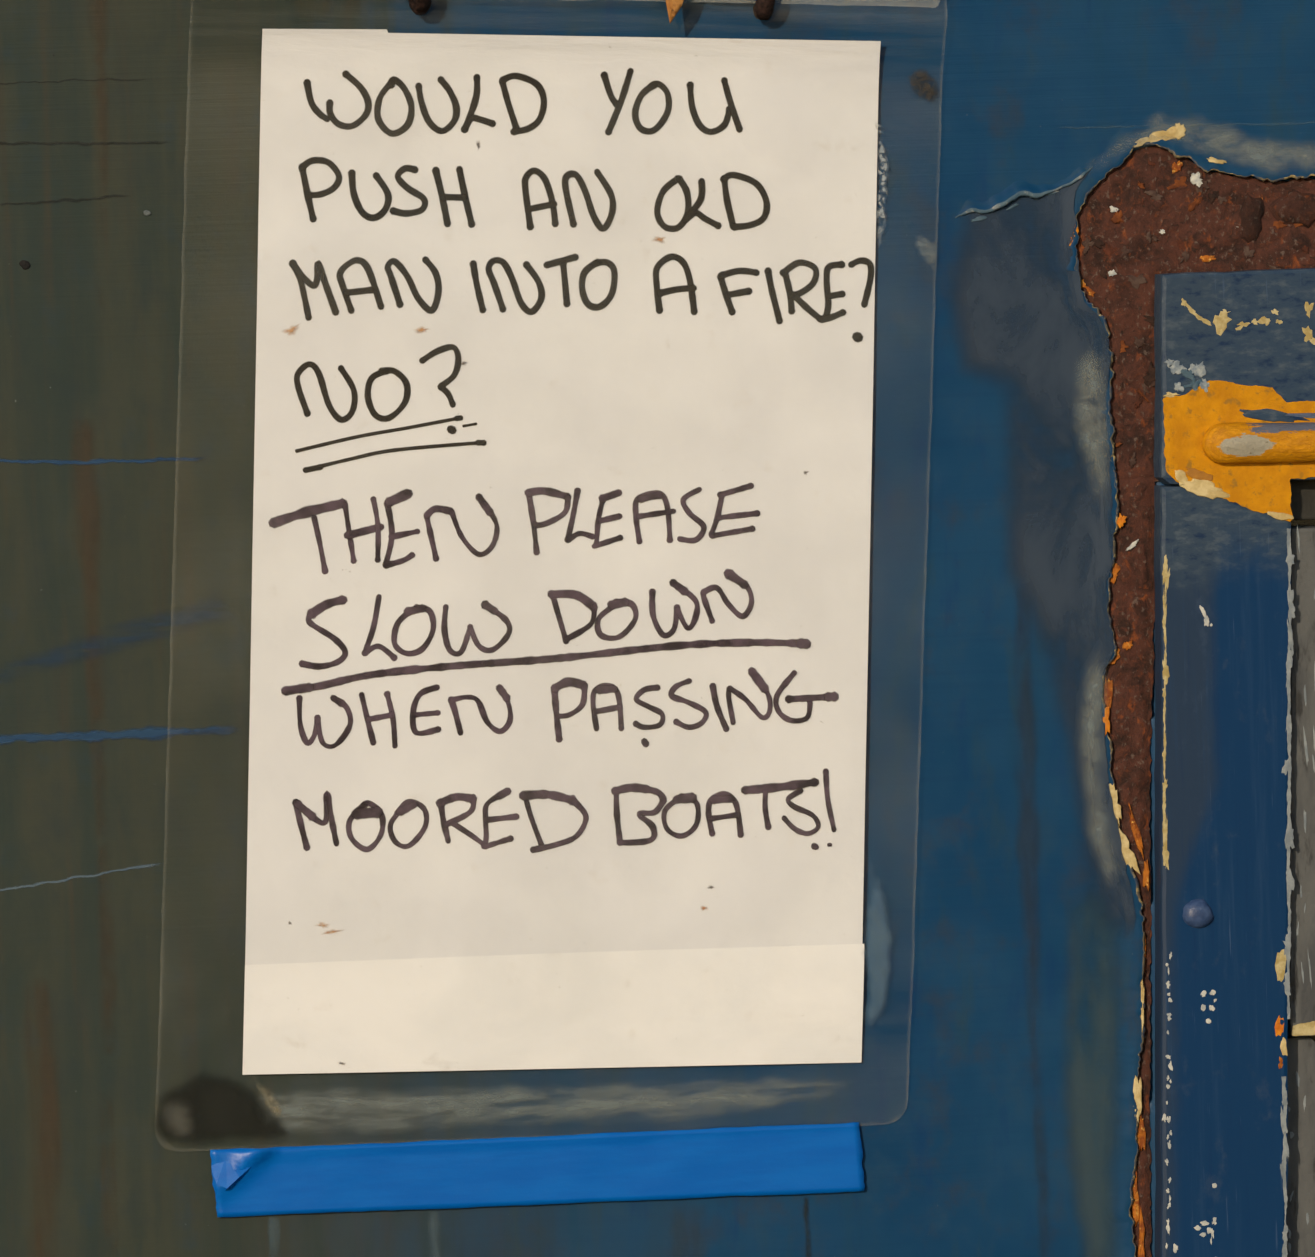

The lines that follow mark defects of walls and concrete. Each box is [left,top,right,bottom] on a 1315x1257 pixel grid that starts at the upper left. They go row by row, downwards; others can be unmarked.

peeling [1181,298,1283,336]
peeling [1302,302,1315,345]
rust [1053,114,1315,1257]
peeling [1162,359,1315,1024]